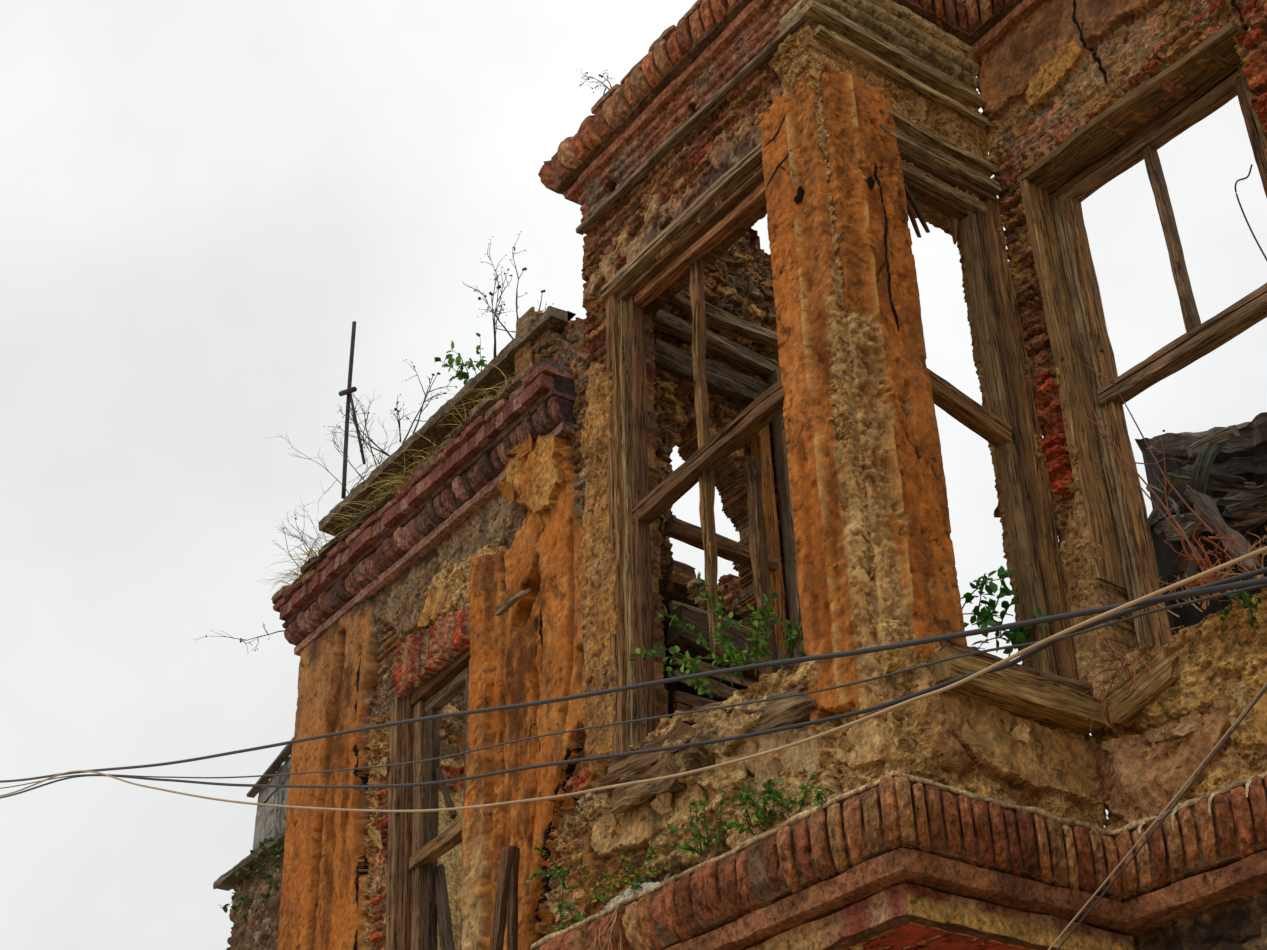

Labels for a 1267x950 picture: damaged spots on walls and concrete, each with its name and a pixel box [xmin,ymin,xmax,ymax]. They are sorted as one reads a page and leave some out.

crack [1072,0,1107,86]
crack [1230,0,1248,41]
spalling [988,0,1267,179]
spalling [1033,371,1080,499]
peeling [843,924,1029,950]